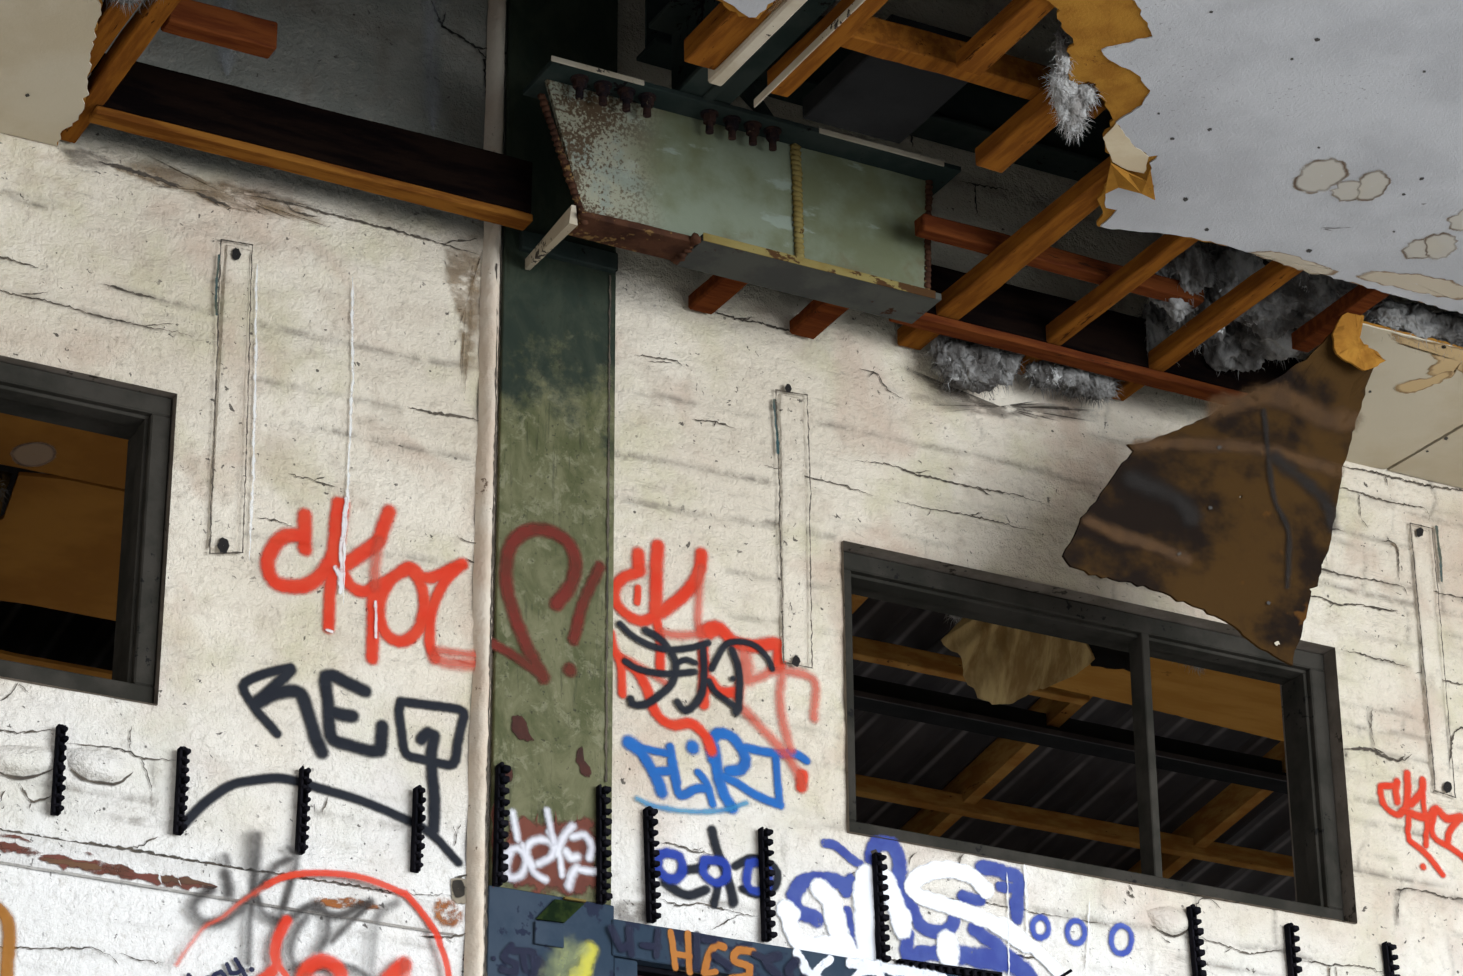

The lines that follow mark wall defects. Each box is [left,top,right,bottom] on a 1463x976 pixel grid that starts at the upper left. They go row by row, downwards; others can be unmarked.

leakage [1293,158,1391,202]
leakage [1251,251,1339,275]
leakage [1357,209,1463,300]
leakage [1392,333,1463,394]
crack [0,161,498,976]